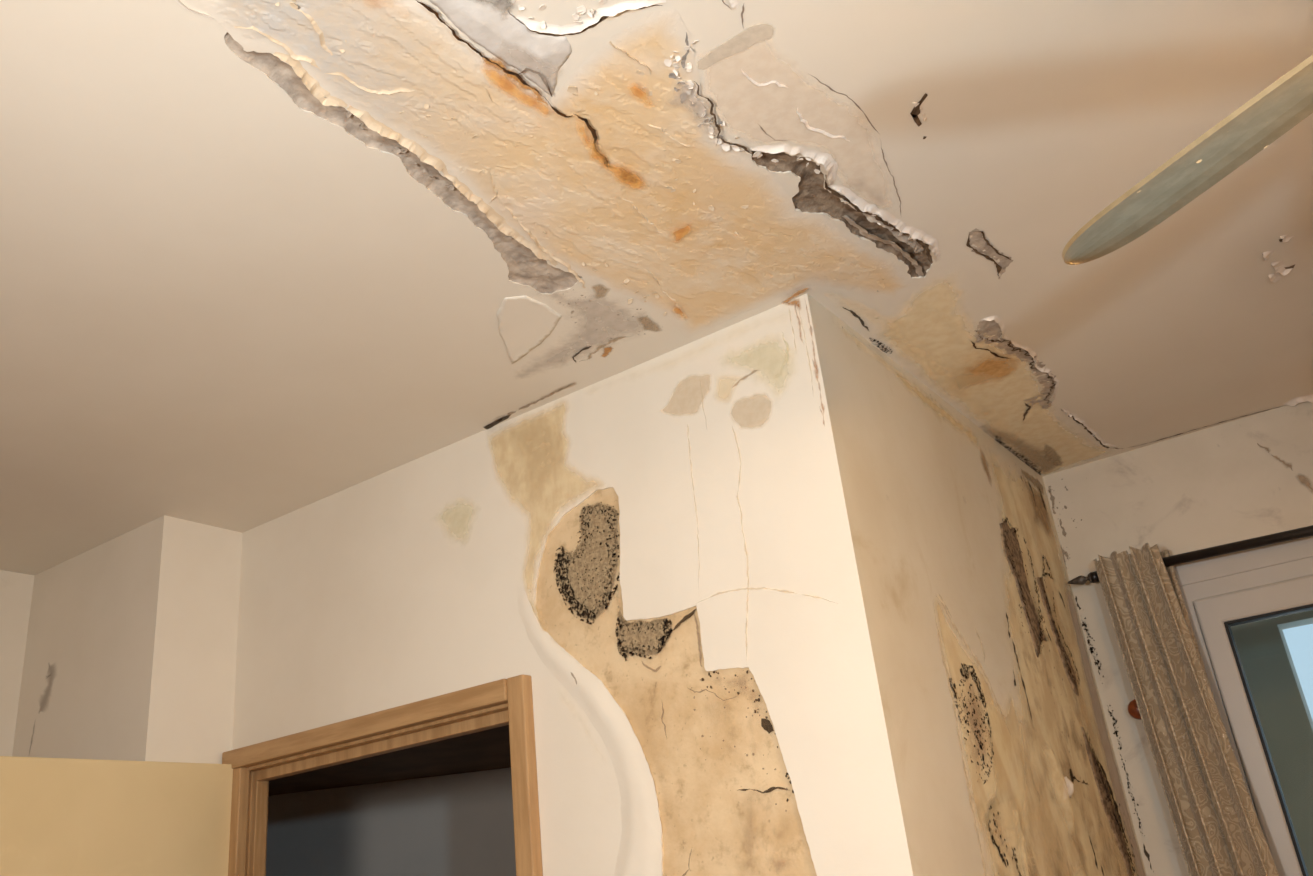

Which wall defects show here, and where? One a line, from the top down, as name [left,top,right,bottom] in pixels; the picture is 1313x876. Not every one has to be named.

flaking render [175,0,940,363]
leakage [741,67,790,88]
leakage [797,105,855,142]
leakage [811,75,901,212]
spalling [966,229,1013,279]
leakage [559,285,659,362]
leakage [664,376,709,414]
leakage [733,370,770,427]
peeling [971,315,1060,421]
leakage [483,383,794,812]
spalling [536,488,817,876]
leakage [939,433,1154,876]